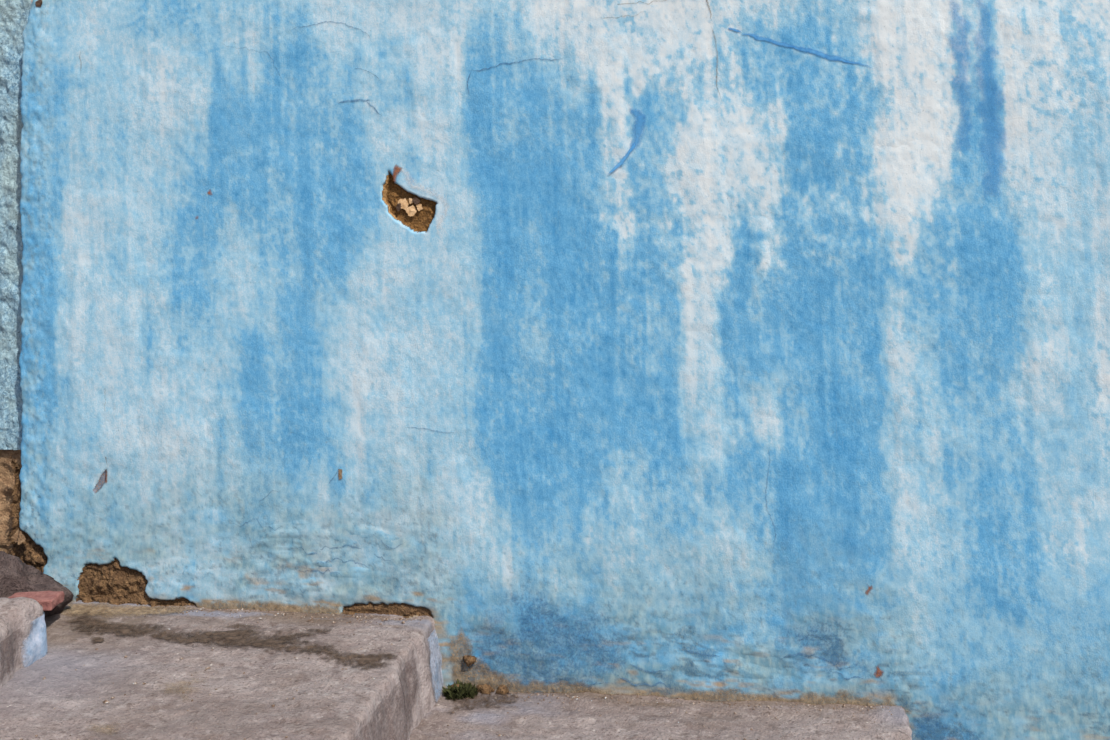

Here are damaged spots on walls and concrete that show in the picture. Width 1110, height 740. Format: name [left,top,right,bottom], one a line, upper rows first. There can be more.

spalling [382,170,437,233]
spalling [9,454,48,573]
spalling [76,558,196,607]
peeling [281,517,438,618]